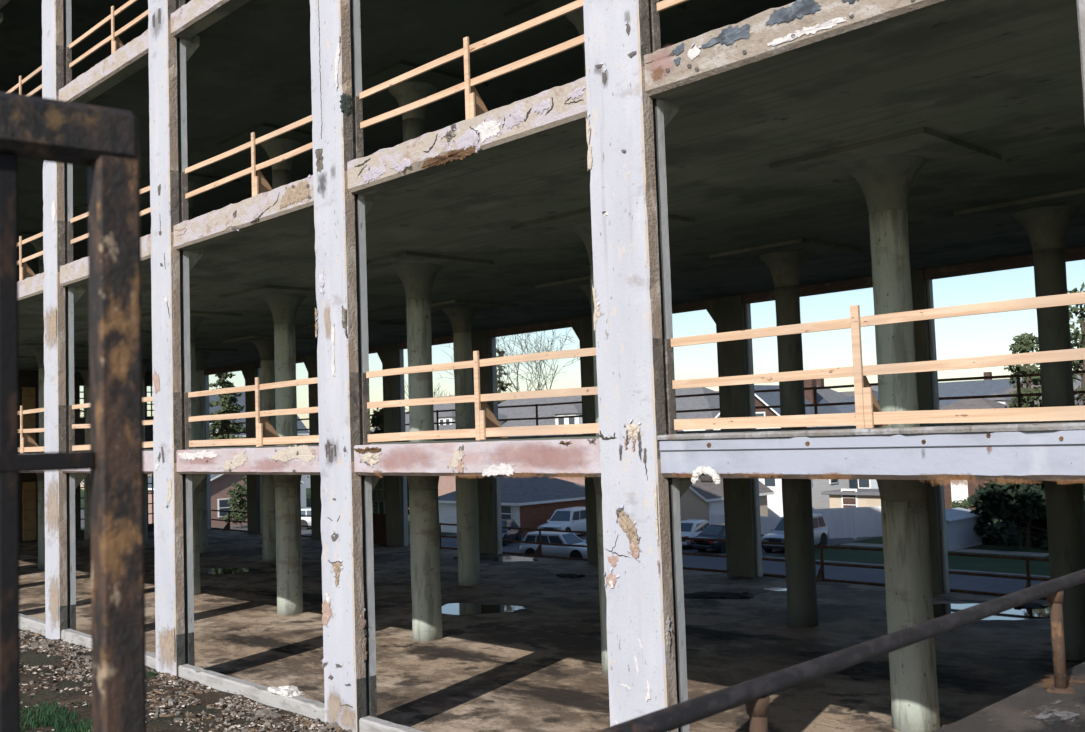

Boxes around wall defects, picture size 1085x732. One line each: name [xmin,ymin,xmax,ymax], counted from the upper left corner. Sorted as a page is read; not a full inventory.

peeling [672,24,751,66]
peeling [765,0,859,46]
spalling [362,98,550,185]
spalling [619,419,646,463]
peeling [482,462,515,476]
spalling [603,504,642,589]
peeling [322,559,343,627]